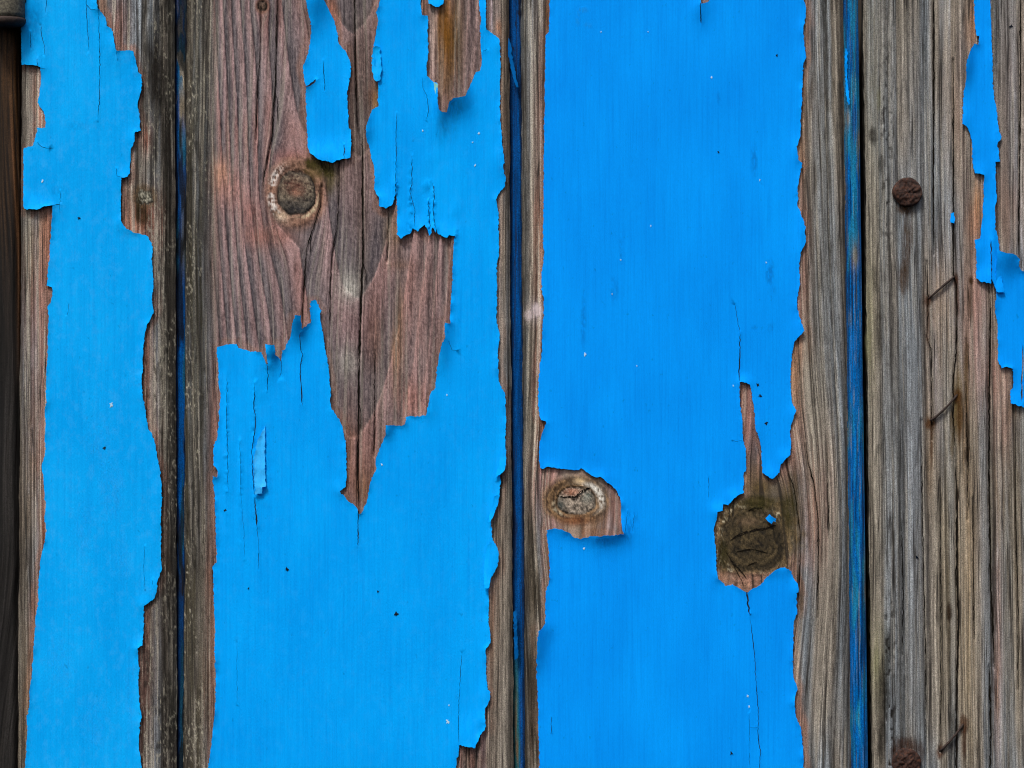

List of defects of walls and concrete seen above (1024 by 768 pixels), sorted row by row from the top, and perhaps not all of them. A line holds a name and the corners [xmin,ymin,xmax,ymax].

peeling [18,64,53,768]
peeling [96,0,455,768]
peeling [420,0,624,768]
crack [724,445,829,768]
peeling [714,0,851,768]
peeling [962,0,1024,407]